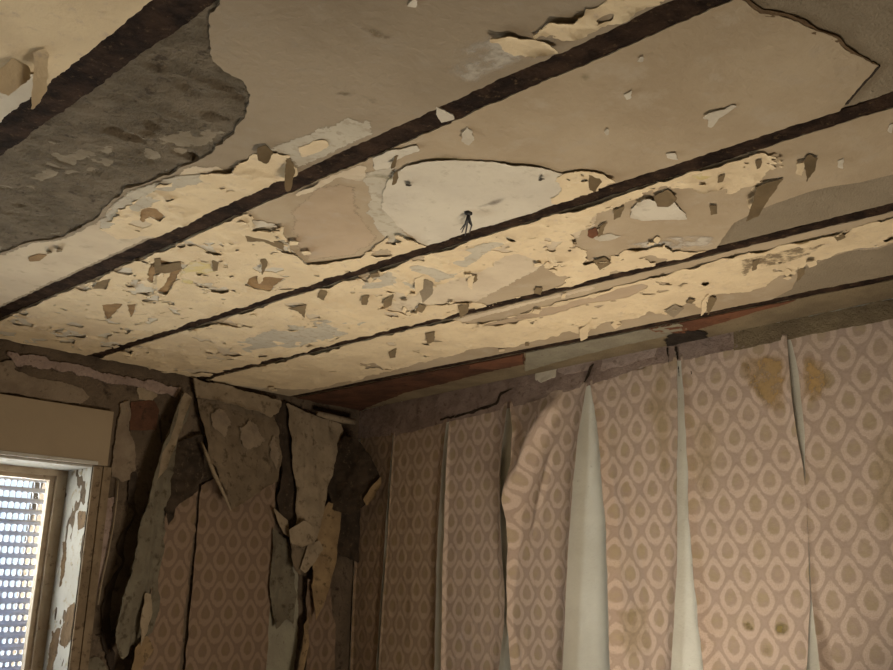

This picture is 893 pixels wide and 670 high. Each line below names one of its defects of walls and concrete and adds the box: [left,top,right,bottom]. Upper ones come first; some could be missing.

peeling [0,0,893,439]
peeling [42,468,92,670]
flaking render [266,550,298,670]